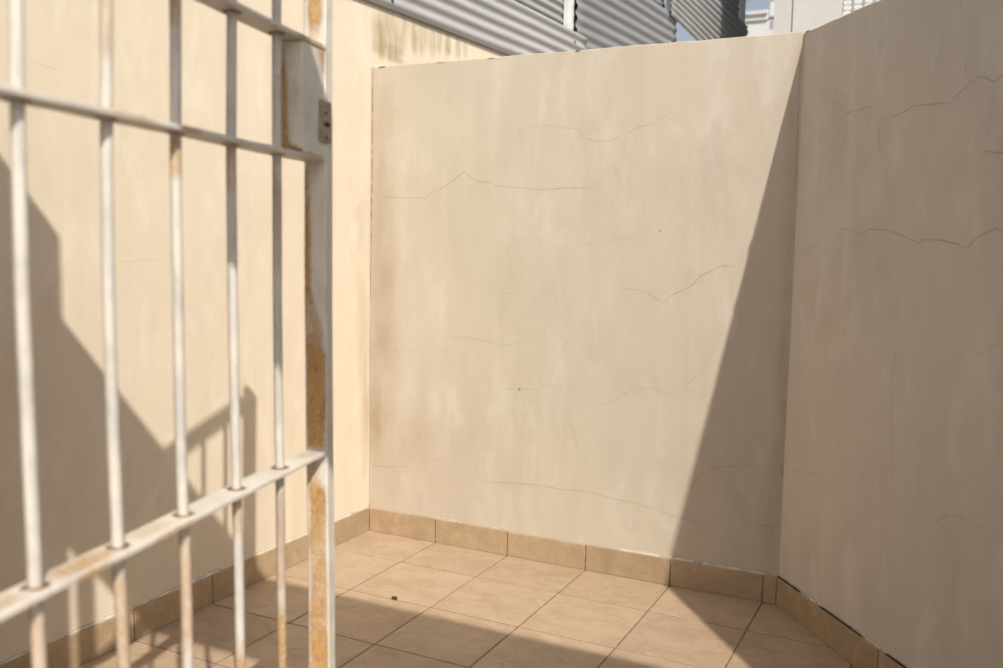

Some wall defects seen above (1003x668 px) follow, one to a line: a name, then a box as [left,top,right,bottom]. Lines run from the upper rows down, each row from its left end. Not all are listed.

corrosion [309,0,321,26]
corrosion [304,172,326,447]
corrosion [277,615,287,668]
corrosion [309,480,328,668]